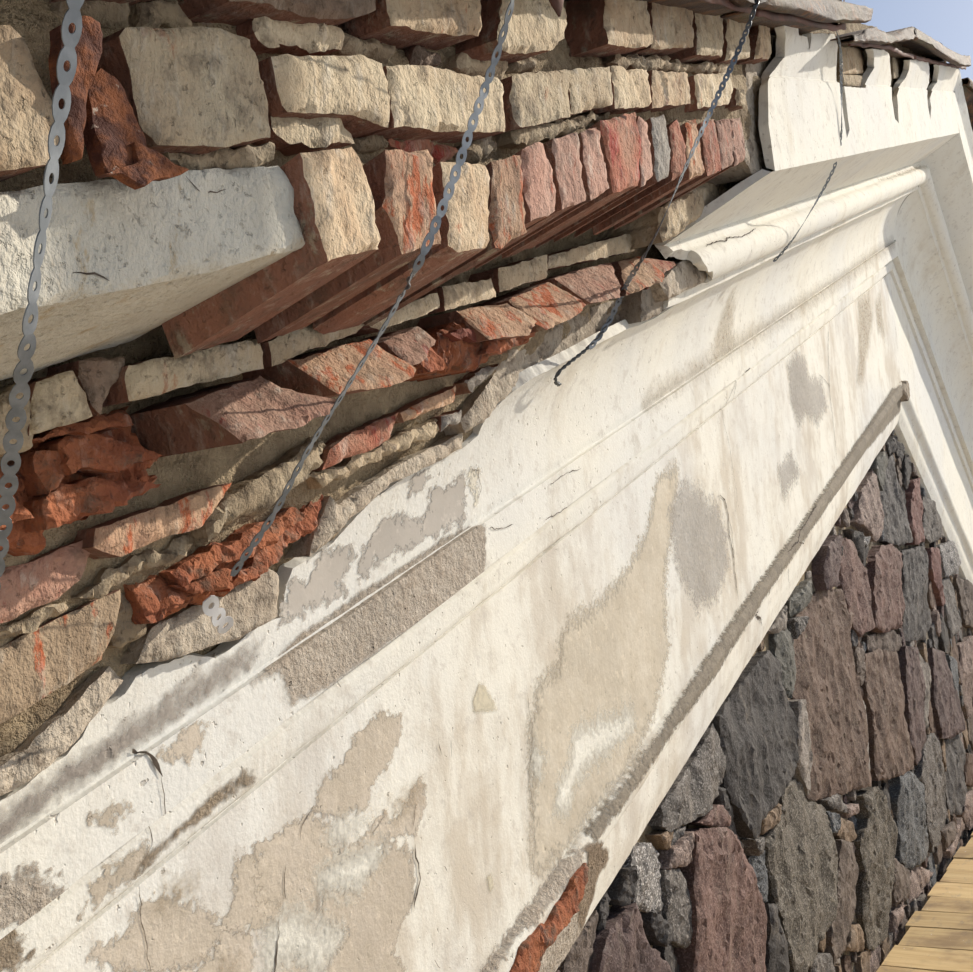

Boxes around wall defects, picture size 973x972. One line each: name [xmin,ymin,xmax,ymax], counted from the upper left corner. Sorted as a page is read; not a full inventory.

crack [706,228,756,247]
flaking render [0,0,776,796]
peeling [480,464,679,972]
flaking render [0,861,65,930]
crack [132,749,166,863]
peeling [78,710,427,972]
crack [272,920,280,972]